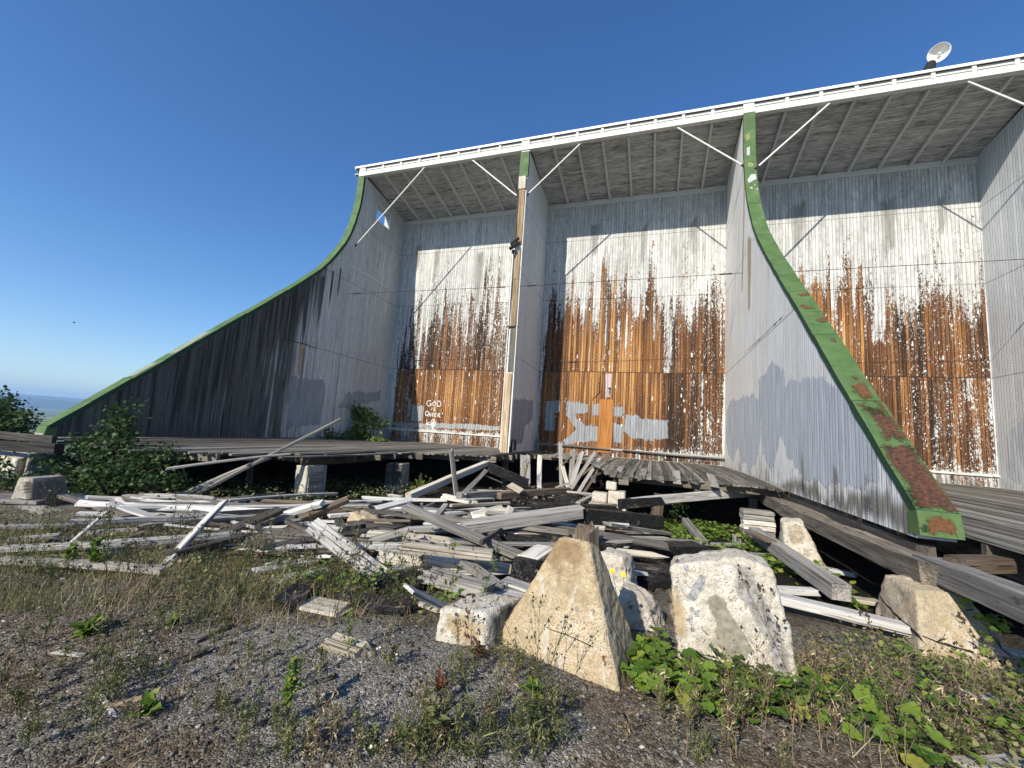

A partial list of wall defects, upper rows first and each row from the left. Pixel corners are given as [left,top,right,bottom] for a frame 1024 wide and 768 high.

leakage [56,267,342,438]
rust [851,375,961,536]